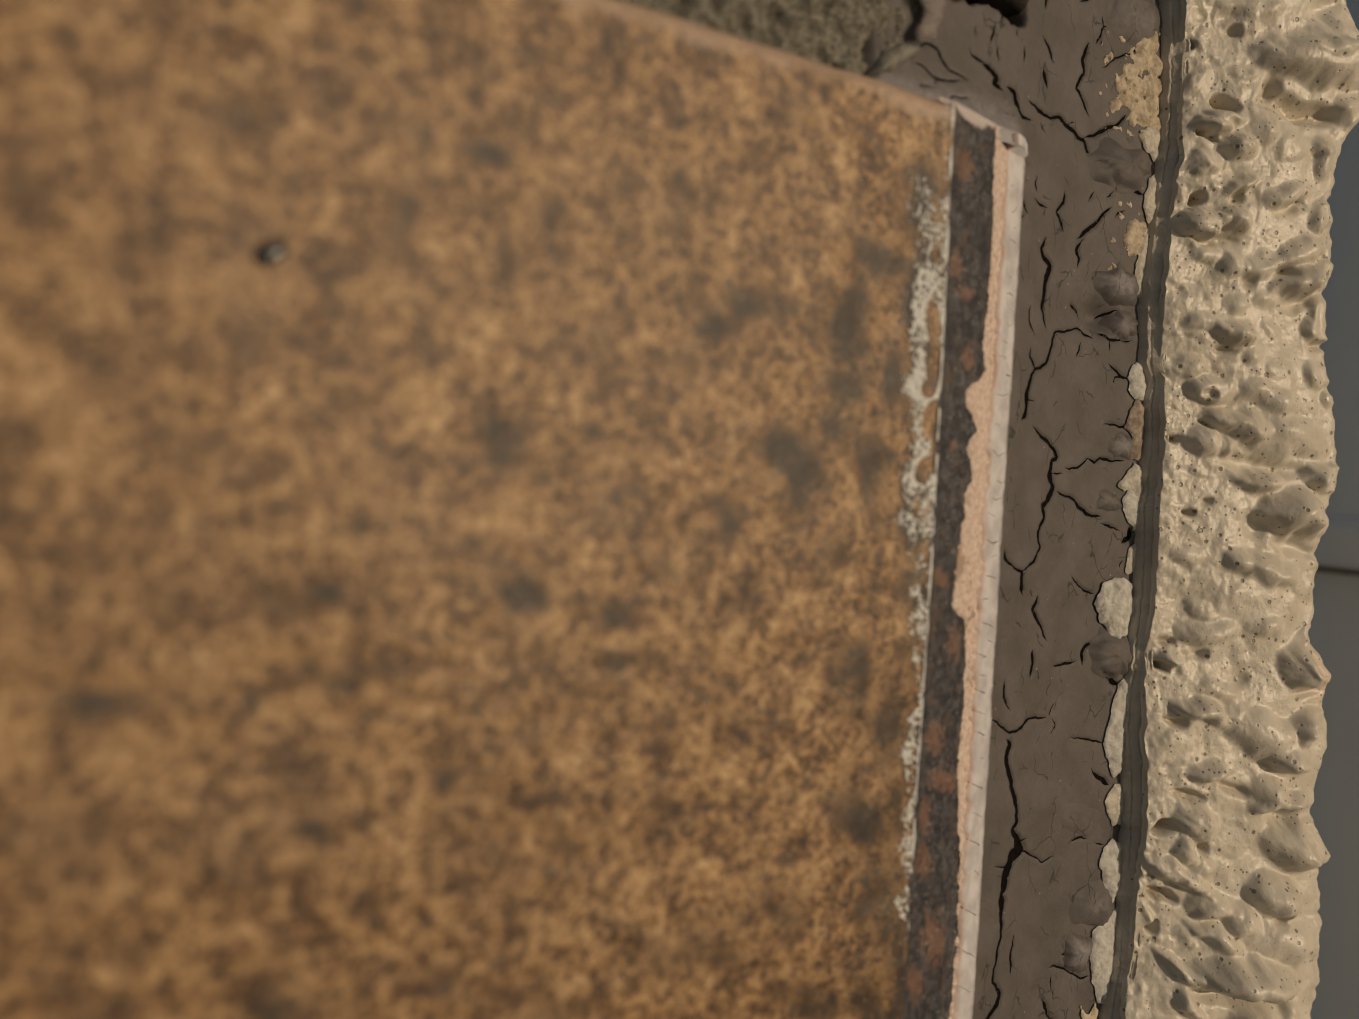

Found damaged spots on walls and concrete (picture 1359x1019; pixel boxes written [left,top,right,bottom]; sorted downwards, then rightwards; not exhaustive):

water stain [892,93,997,930]
crack [914,0,1144,1019]